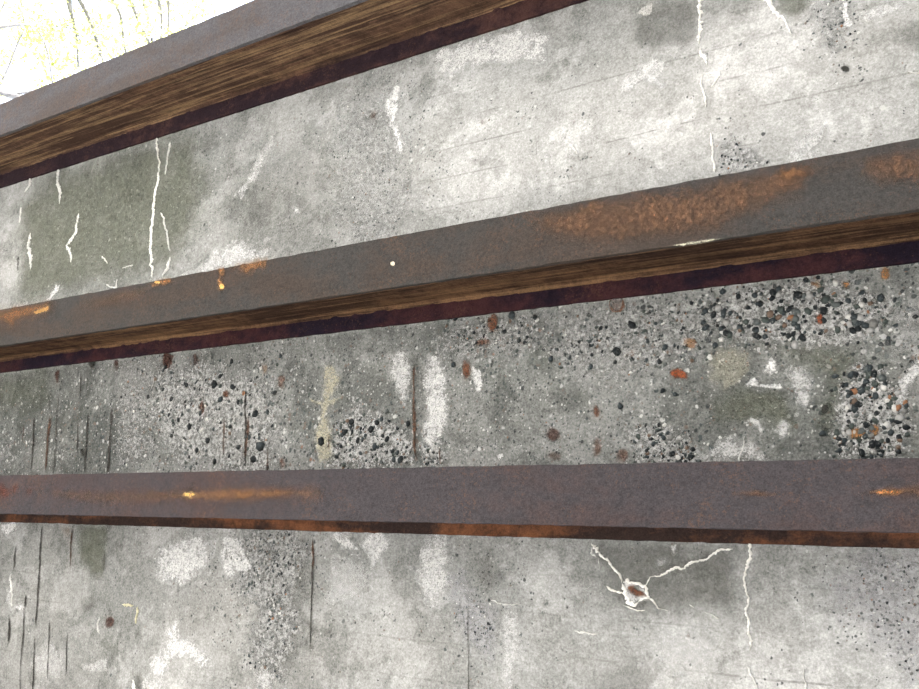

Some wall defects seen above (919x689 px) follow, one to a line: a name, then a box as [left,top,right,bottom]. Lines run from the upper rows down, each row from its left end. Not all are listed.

crack [697,0,720,108]
crack [764,0,792,36]
crack [709,133,717,172]
crack [19,178,33,269]
crack [56,170,79,262]
crack [102,138,171,288]
rust [548,172,800,237]
rust [0,304,48,324]
crack [584,543,758,689]